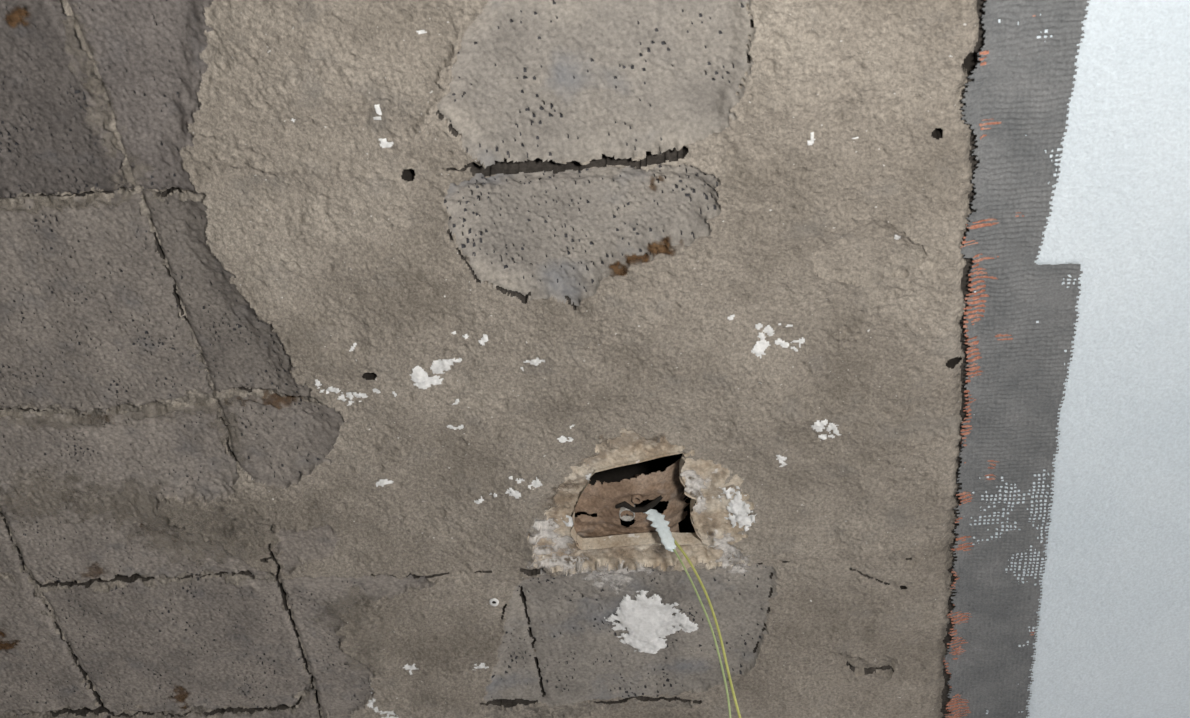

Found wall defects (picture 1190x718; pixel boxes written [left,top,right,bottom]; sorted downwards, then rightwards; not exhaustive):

crack [436,110,459,137]
crack [446,146,689,177]
crack [153,232,188,321]
spalling [0,0,435,718]
peeling [409,358,462,389]
crack [218,417,237,461]
crack [371,570,492,579]
spalling [474,428,778,718]
crack [0,512,322,718]
crack [753,561,790,653]
rust [0,631,20,651]
crack [594,696,702,705]